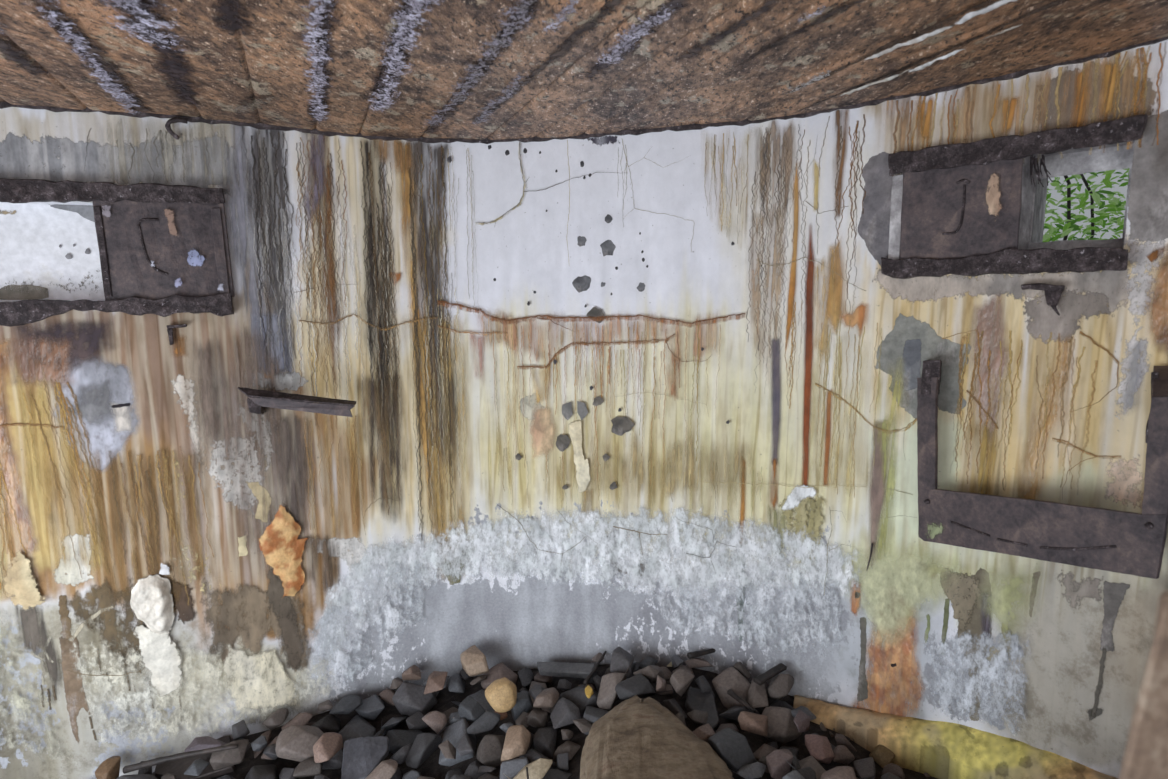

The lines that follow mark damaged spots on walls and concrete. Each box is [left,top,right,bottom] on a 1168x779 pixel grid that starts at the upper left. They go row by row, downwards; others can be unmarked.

corrosion [887,84,977,153]
corrosion [989,43,1163,145]
crack [477,140,694,257]
corrosion [986,173,1002,221]
crack [294,284,745,370]
corrosion [785,168,866,487]
peeling [900,339,921,391]
corrosion [1147,248,1168,351]
leakage [0,120,474,743]
leakage [1105,454,1144,508]
corrosion [853,599,922,717]
leakage [1086,581,1130,720]